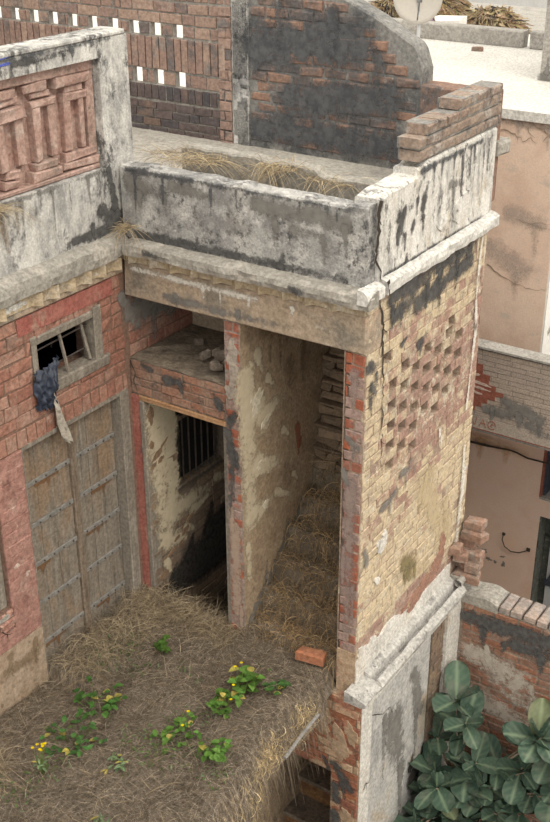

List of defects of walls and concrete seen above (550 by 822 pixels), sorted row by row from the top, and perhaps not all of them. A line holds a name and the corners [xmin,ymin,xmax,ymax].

leakage [238,1,412,168]
crack [500,122,550,142]
leakage [0,185,58,243]
leakage [384,135,494,276]
crack [374,201,390,466]
peeling [473,358,504,410]
peeling [145,403,225,581]
peeling [224,347,291,581]
peeling [355,531,446,669]
peeling [315,715,358,763]
leakage [382,666,424,815]